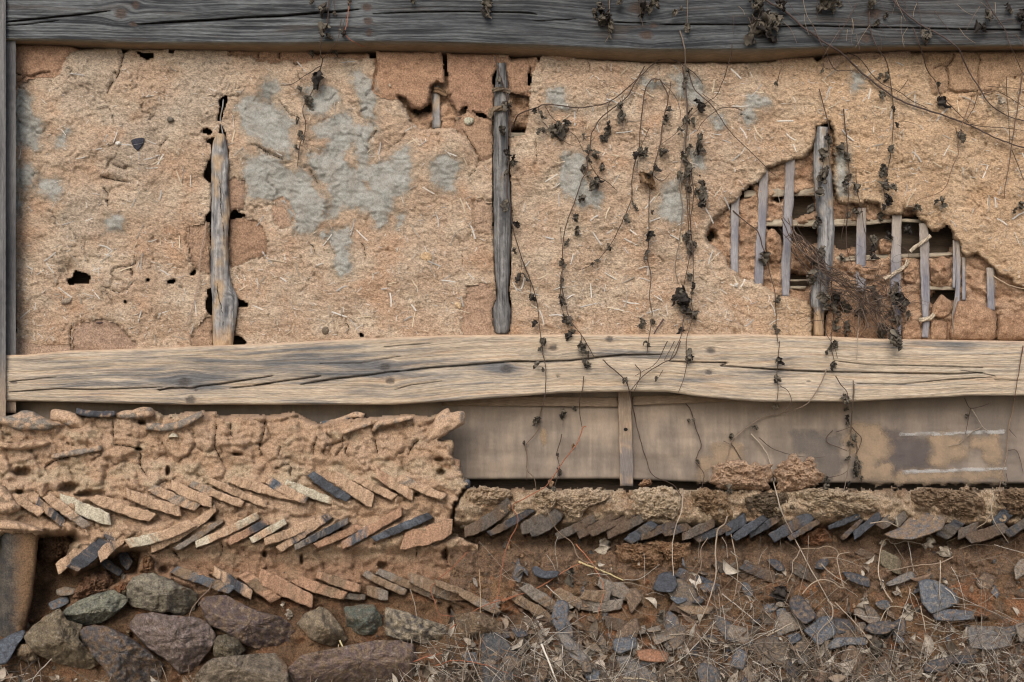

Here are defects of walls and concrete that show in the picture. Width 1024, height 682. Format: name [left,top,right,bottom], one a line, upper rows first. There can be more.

peeling [228,51,537,277]
spalling [707,129,1024,340]
water stain [881,431,929,475]